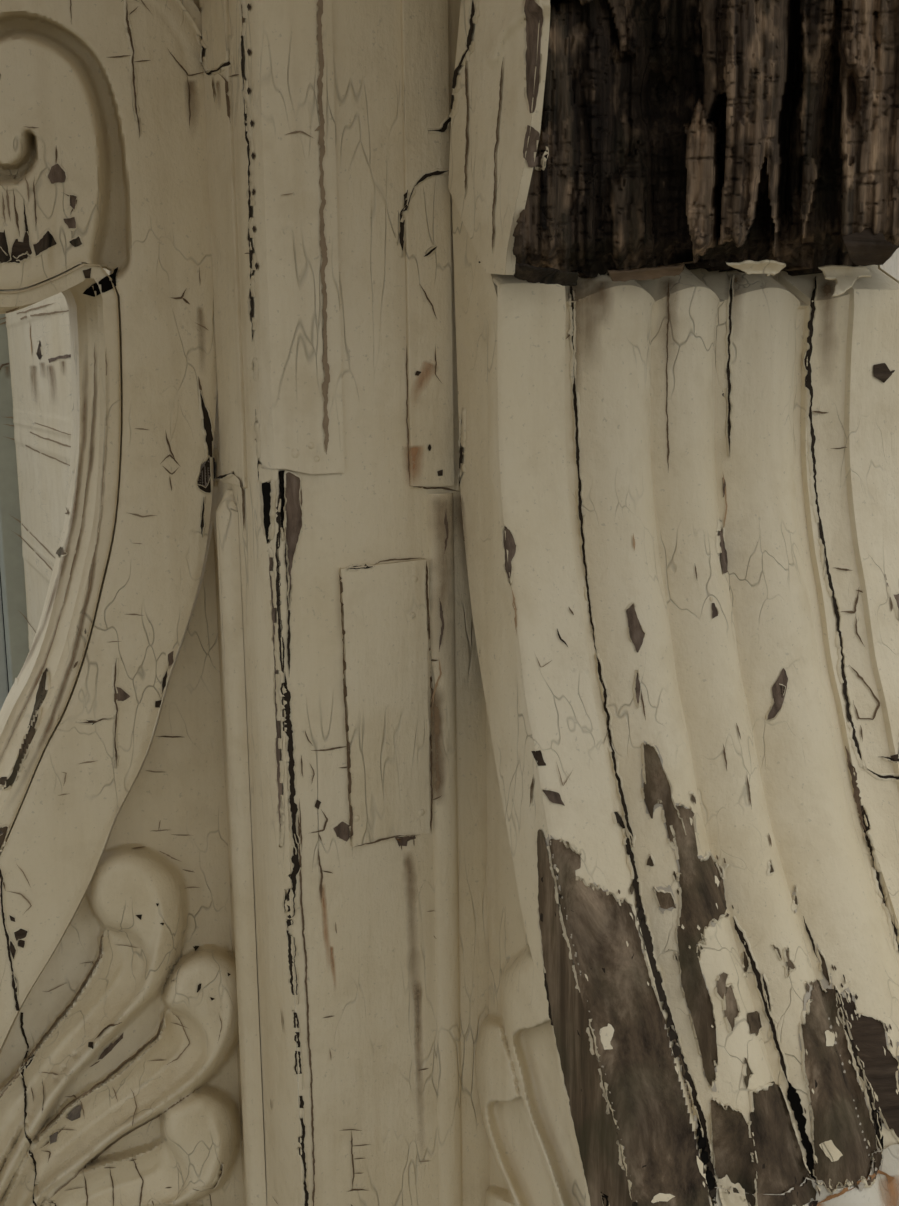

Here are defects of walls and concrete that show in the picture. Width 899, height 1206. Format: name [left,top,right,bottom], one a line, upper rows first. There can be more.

peeling [521,0,549,171]
peeling [0,164,82,263]
crack [106,0,330,491]
crack [395,0,503,316]
crack [0,302,71,370]
crack [3,417,71,466]
crack [723,274,735,528]
crack [9,514,55,570]
peeling [502,525,517,632]
peeling [0,668,50,791]
peeling [530,748,574,806]
peeling [537,741,899,1206]